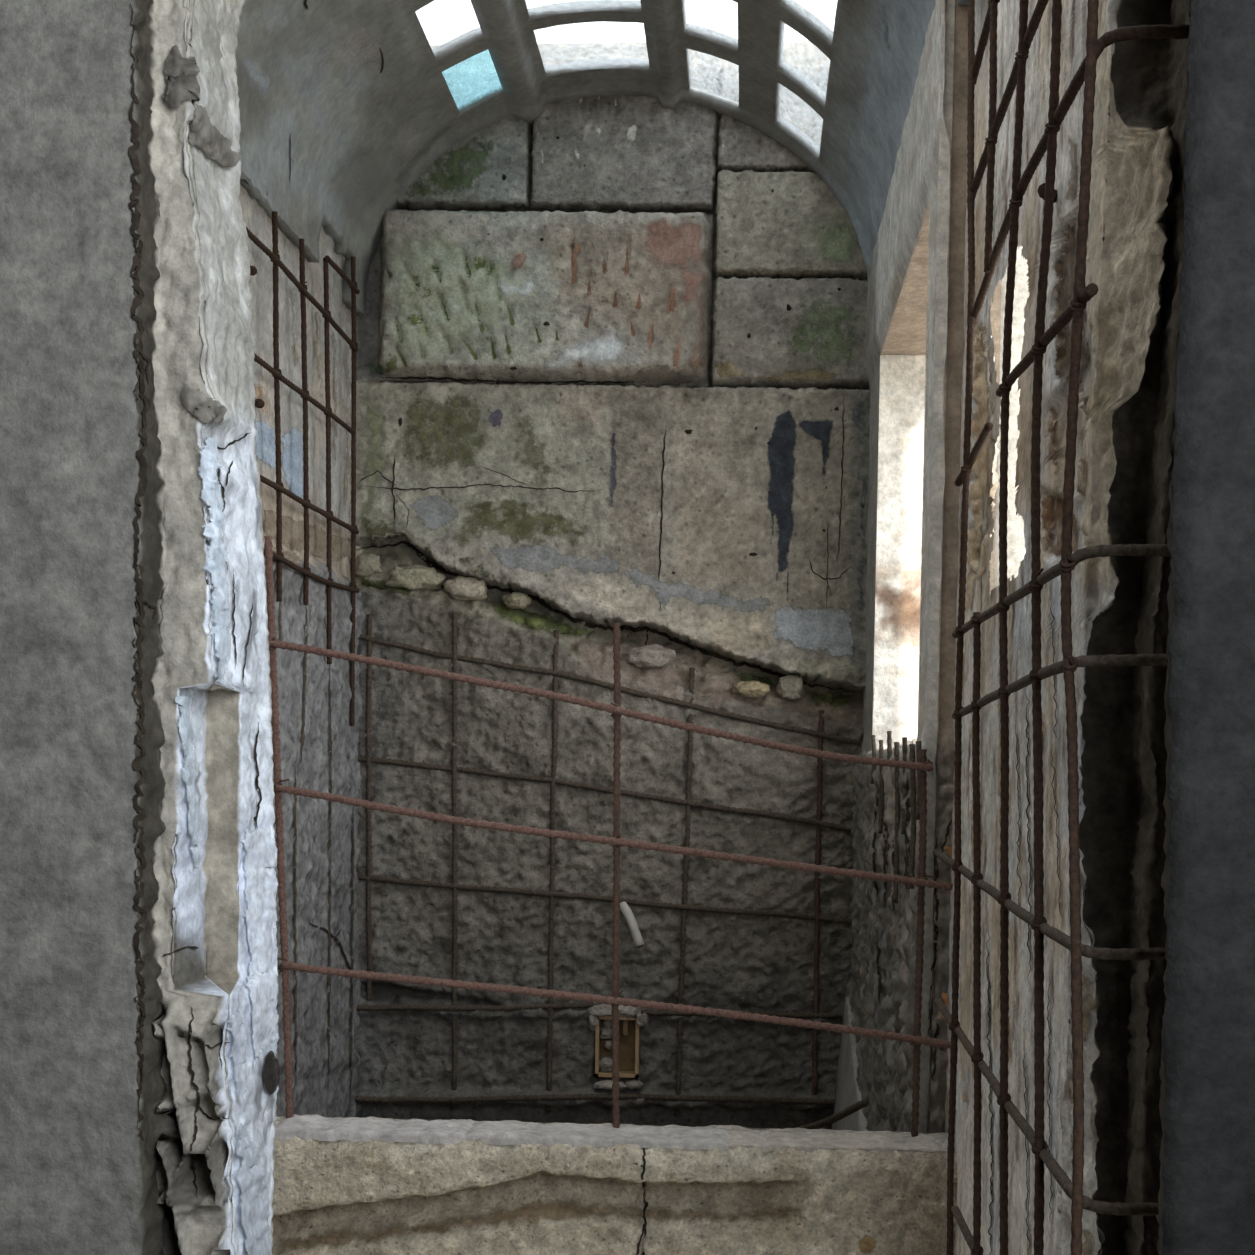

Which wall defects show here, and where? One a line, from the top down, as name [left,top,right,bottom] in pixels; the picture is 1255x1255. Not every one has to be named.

corrosion [646,220,703,328]
damp [553,335,622,365]
spalling [246,211,922,1129]
crack [358,431,855,693]
spalling [933,0,1189,1255]
peeling [233,1123,271,1255]
crack [633,1148,648,1255]
spalling [859,1236,876,1253]